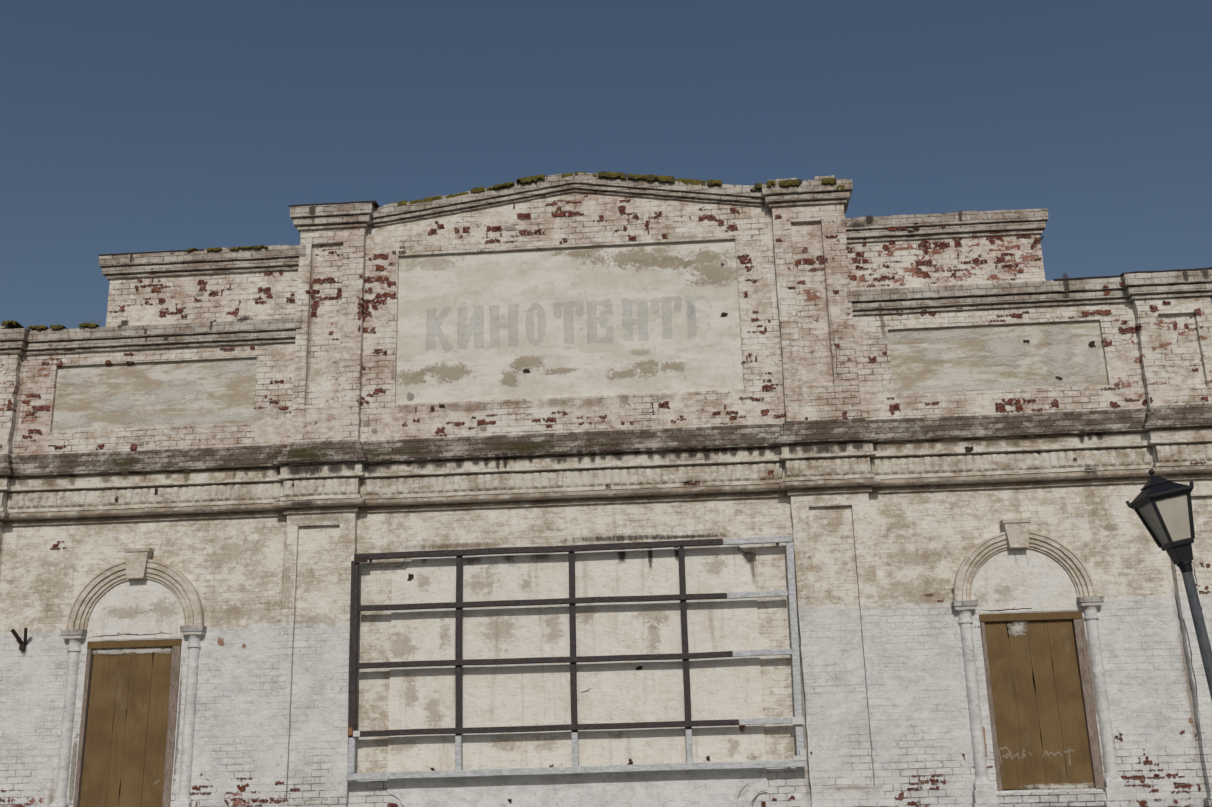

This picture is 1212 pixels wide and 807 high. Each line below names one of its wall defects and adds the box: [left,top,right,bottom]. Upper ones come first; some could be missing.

spalling [109,268,342,318]
spalling [357,246,406,333]
spalling [6,394,69,449]
water stain [233,452,534,478]
water stain [552,436,1057,463]
spalling [190,774,300,807]
spalling [1121,749,1201,807]